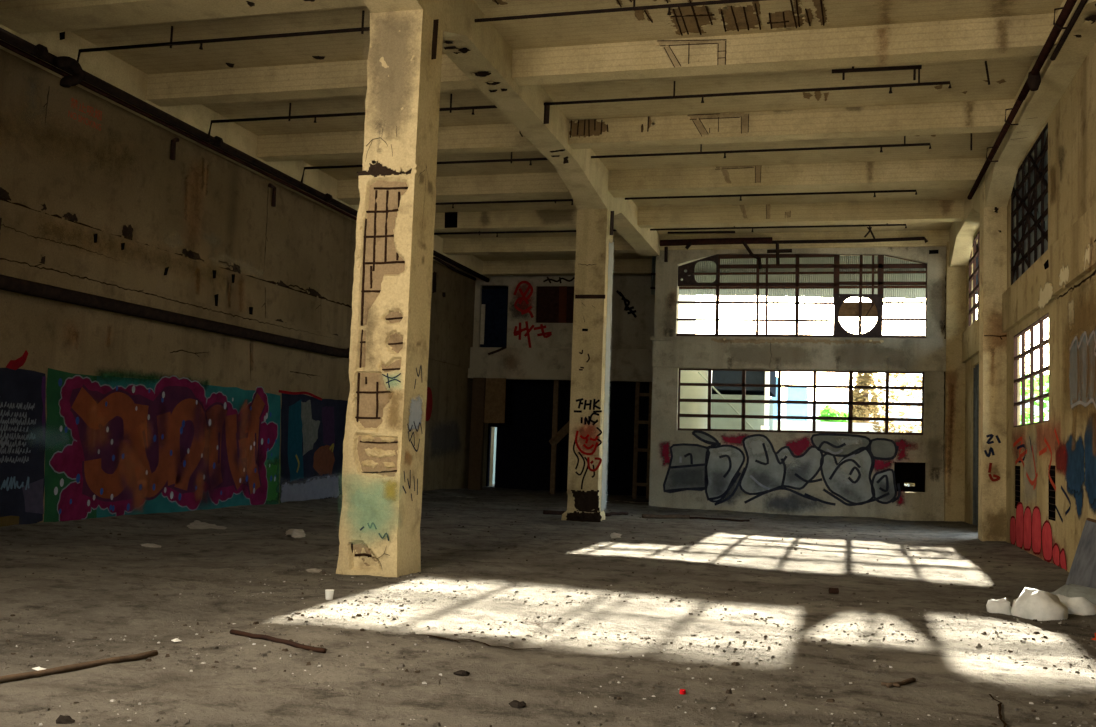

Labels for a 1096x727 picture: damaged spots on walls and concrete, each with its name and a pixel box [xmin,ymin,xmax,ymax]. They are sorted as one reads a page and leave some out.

spalling [616,0,829,68]
spalling [549,119,610,164]
spalling [355,159,417,477]
crack [989,694,1012,727]